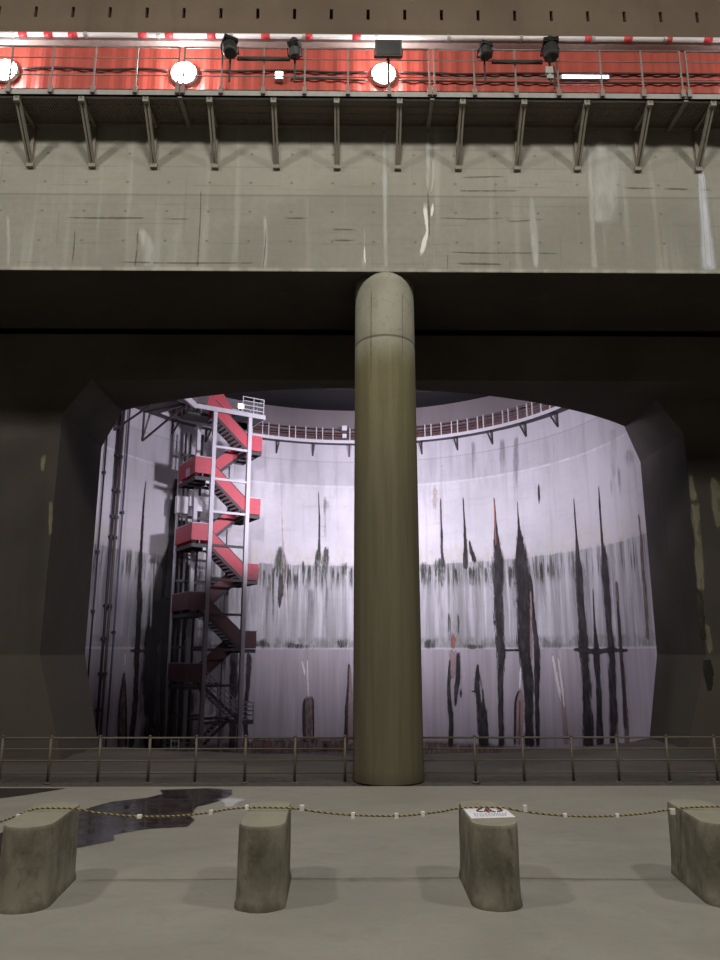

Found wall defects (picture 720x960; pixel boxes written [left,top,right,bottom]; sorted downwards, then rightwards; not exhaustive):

leakage [698,171,715,270]
leakage [128,479,196,748]
leakage [425,498,540,754]
leakage [573,486,629,747]